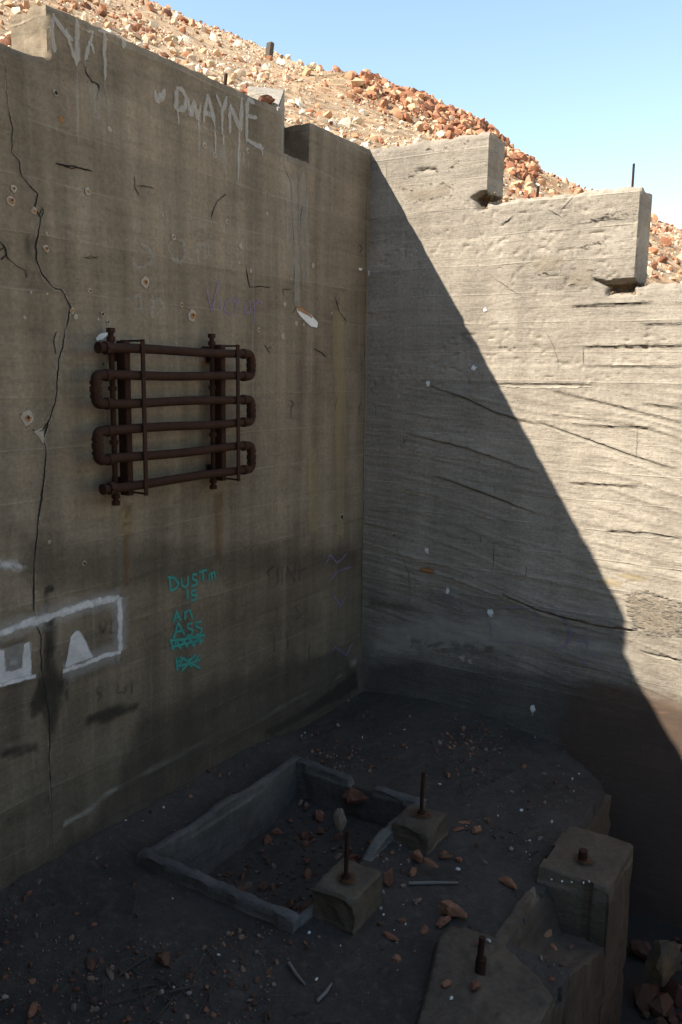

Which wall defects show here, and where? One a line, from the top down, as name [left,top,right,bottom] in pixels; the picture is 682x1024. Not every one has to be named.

crack [56,163,93,172]
peeling [283,302,318,328]
crack [438,302,678,471]
crack [0,62,71,845]
crack [608,530,682,541]
crack [480,536,682,662]